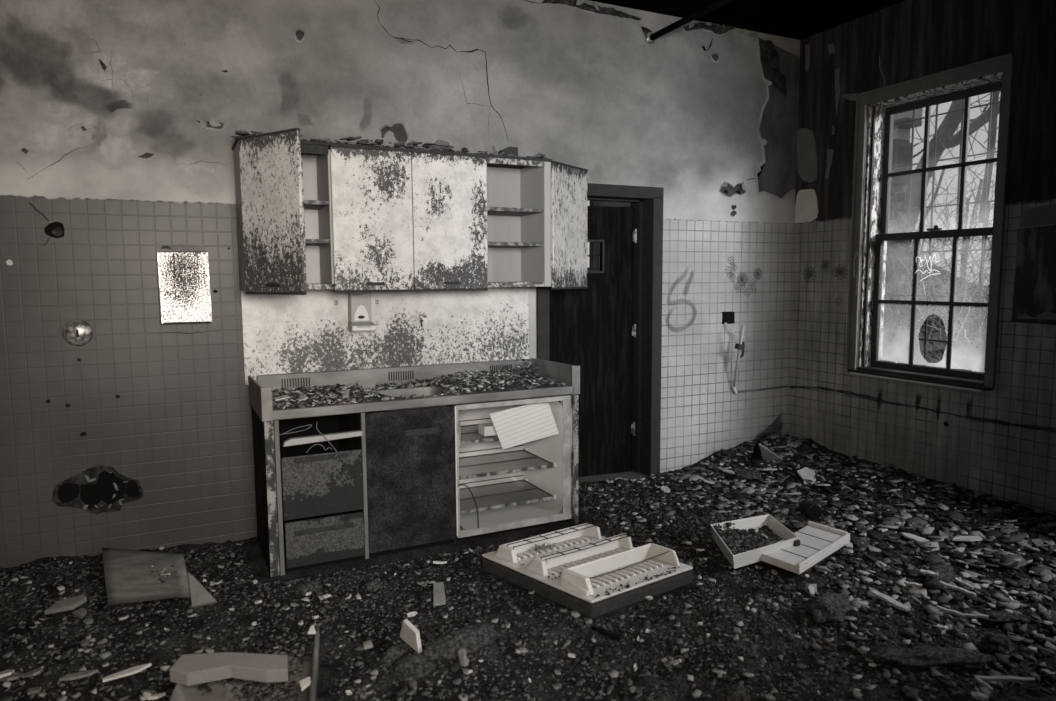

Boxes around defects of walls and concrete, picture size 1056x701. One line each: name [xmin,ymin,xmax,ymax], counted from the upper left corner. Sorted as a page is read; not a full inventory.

damp [33,57,148,164]
crack [375,1,508,138]
spalling [539,0,652,36]
peeling [682,21,834,223]
hole [51,465,144,515]